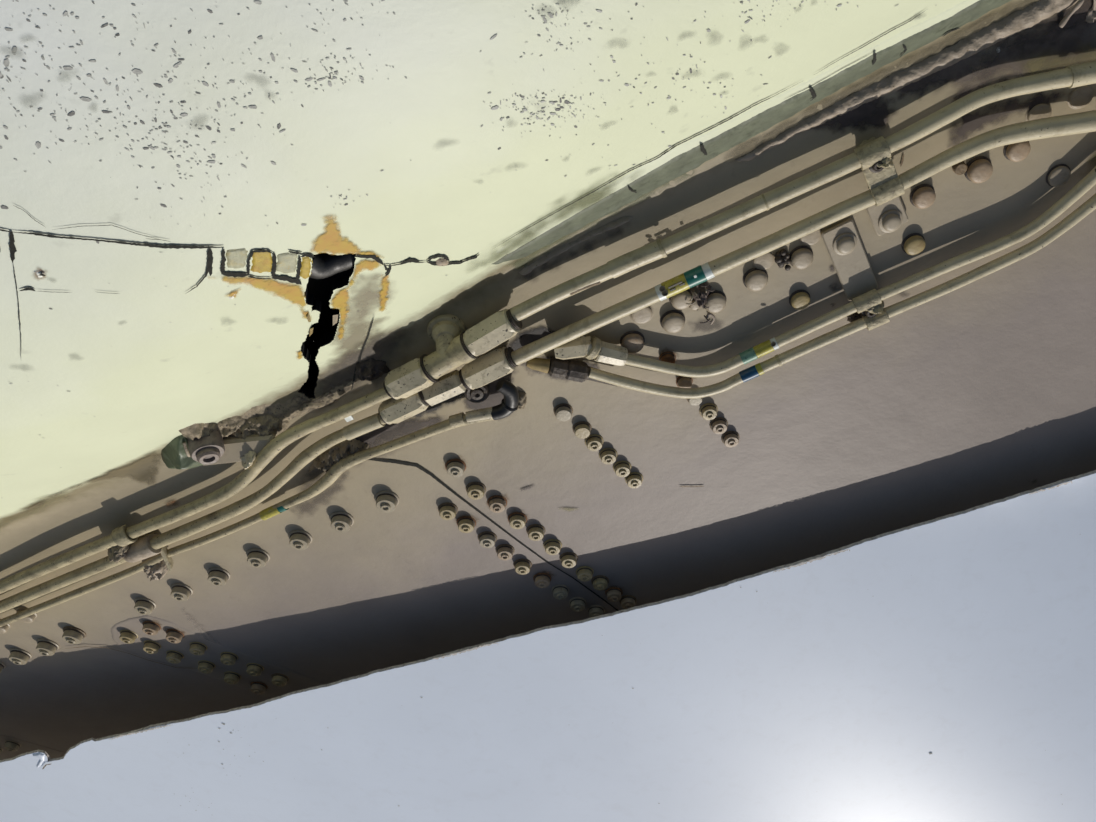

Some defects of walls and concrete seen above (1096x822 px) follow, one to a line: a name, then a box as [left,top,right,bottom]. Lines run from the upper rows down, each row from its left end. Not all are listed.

crack [355,10,926,276]
water stain [815,97,893,130]
water stain [899,0,1096,101]
water stain [951,92,1060,145]
crack [0,205,314,351]
spalling [223,216,390,389]